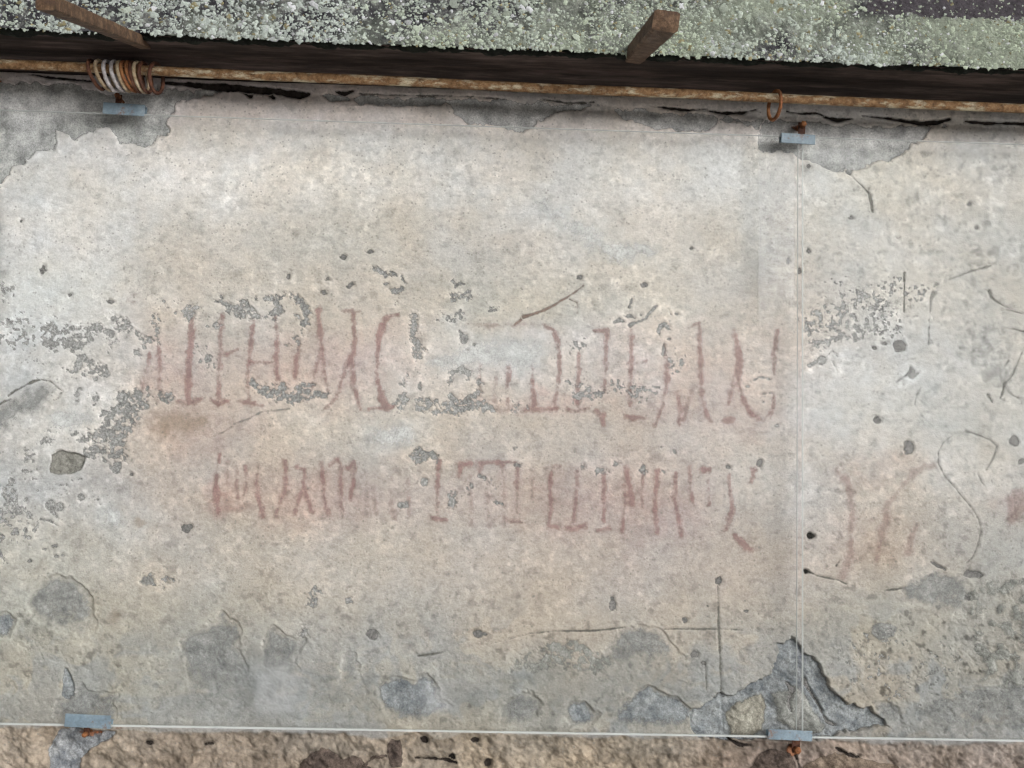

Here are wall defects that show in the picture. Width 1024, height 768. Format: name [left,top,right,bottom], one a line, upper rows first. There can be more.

peeling [0,81,218,183]
peeling [323,94,599,132]
peeling [615,108,947,175]
spalling [798,276,930,368]
spalling [0,281,174,476]
crack [938,430,998,506]
spalling [619,561,1024,740]